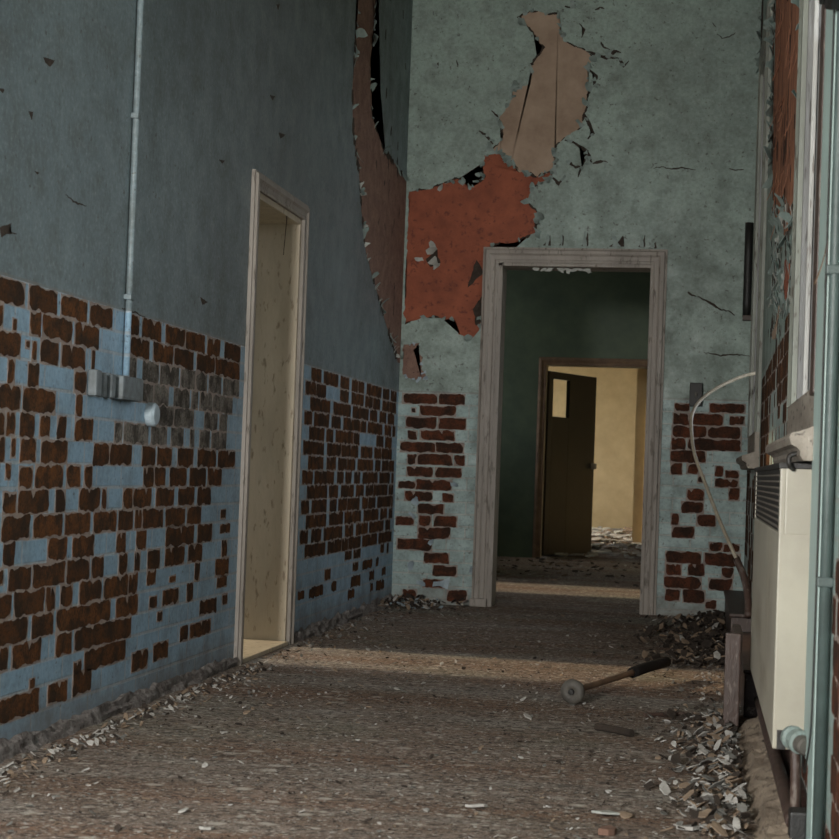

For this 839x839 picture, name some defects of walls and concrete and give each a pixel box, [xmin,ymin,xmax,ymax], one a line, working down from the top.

peeling [0,275,241,725]
peeling [298,366,468,603]
flaking render [352,0,629,383]
peeling [663,0,799,610]
peeling [825,558,839,839]